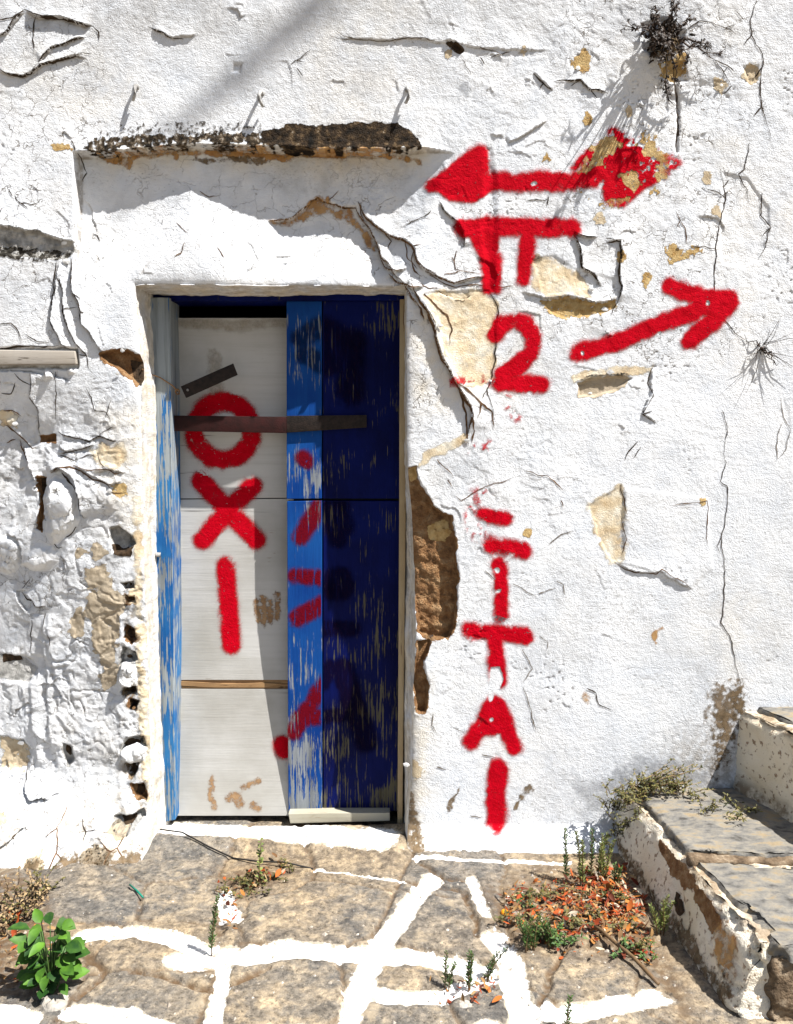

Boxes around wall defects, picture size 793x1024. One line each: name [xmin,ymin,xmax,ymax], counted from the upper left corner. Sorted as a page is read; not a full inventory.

crack [0,9,100,78]
crack [331,31,508,73]
crack [676,0,771,290]
flaking render [0,225,78,264]
crack [272,191,514,445]
peeling [531,253,617,320]
crack [0,260,126,548]
flaking render [98,348,144,387]
flaking render [35,475,47,533]
flaking render [408,433,470,714]
peeling [67,526,141,710]
damp [713,686,745,767]